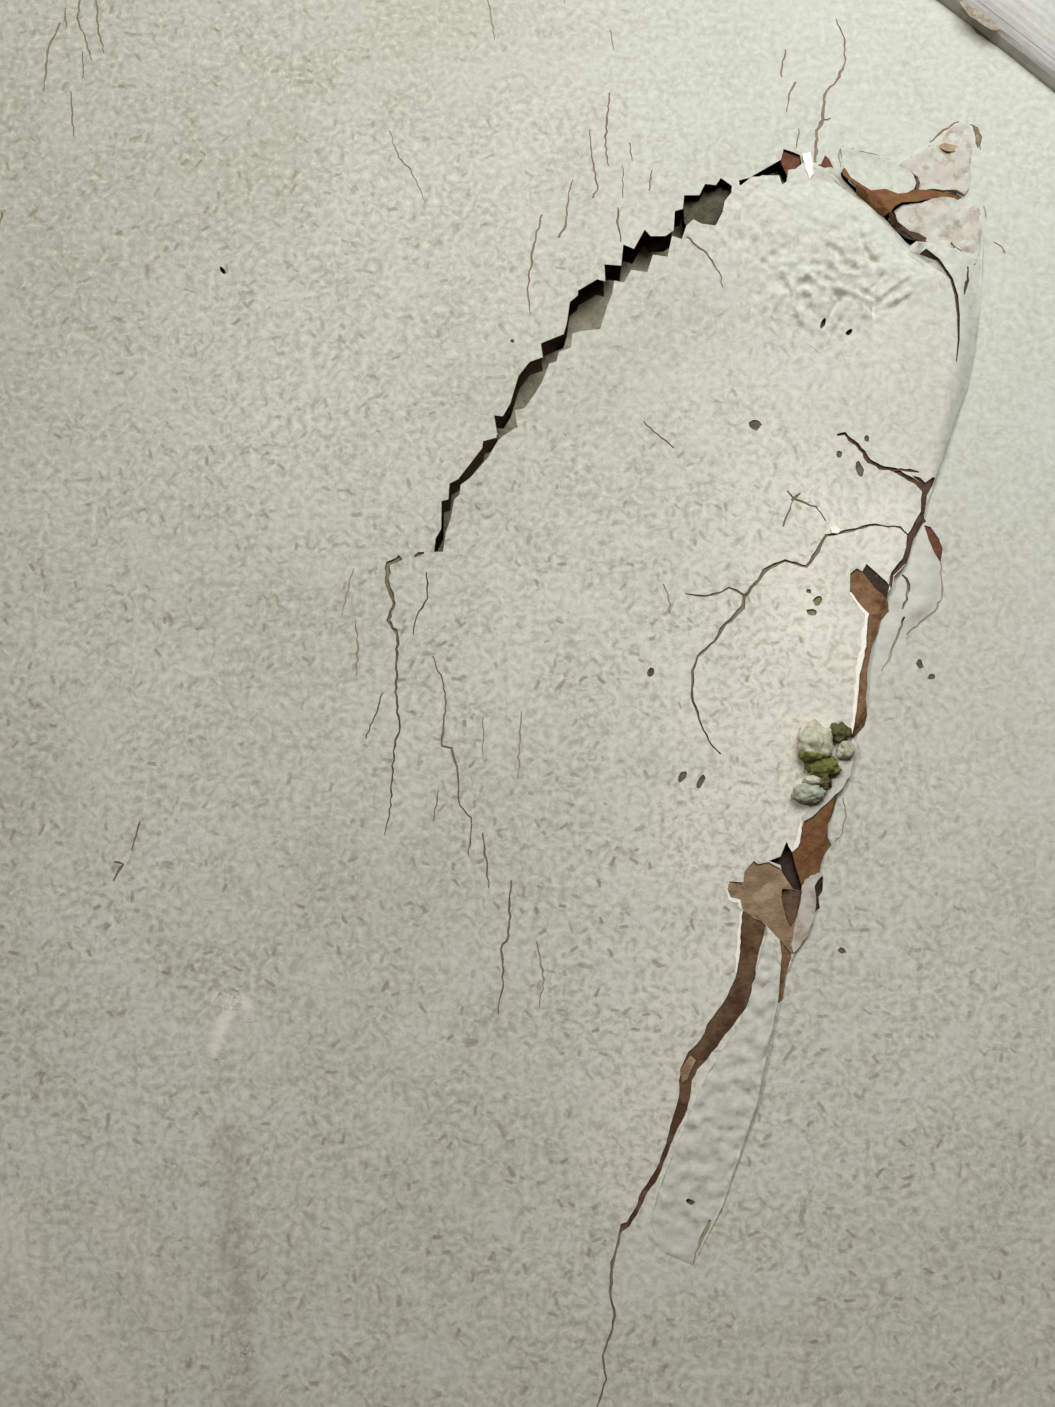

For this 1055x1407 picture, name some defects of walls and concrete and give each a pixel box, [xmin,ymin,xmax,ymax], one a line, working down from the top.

crack [770,20,888,184]
flaking render [802,123,983,265]
crack [929,121,982,150]
crack [889,212,969,361]
crack [341,93,730,1014]
crack [663,433,943,754]
flaking render [650,524,943,1265]
crack [834,799,847,843]
crack [597,911,791,1407]